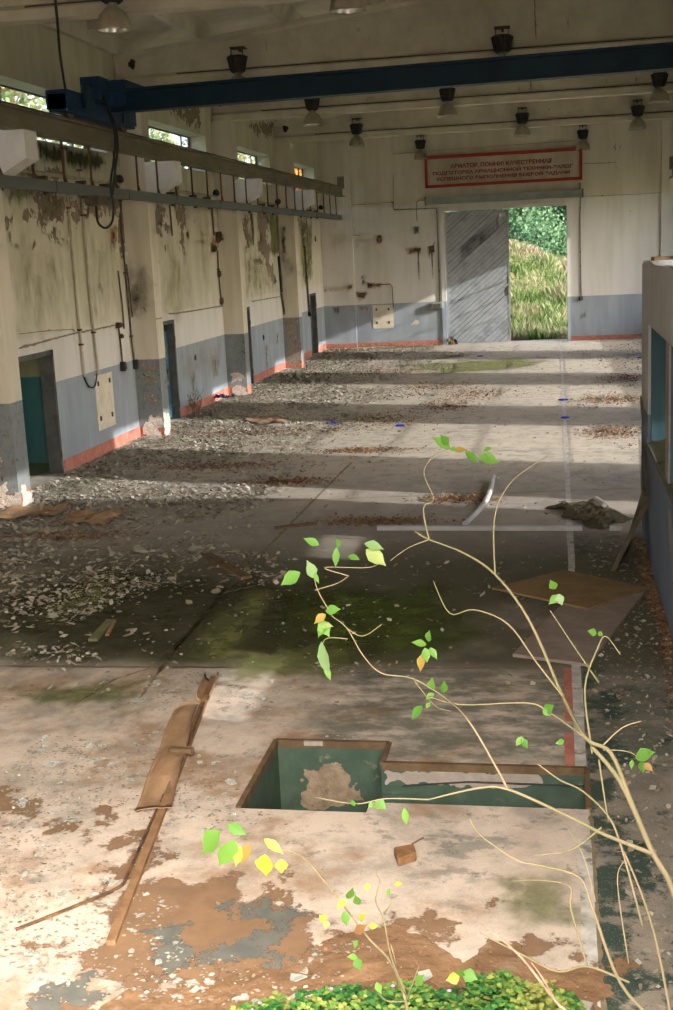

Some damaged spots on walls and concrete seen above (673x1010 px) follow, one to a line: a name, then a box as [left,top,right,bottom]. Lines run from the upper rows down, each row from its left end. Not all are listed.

flaking render [285,318,302,367]
flaking render [230,372,248,395]
flaking render [143,412,171,436]